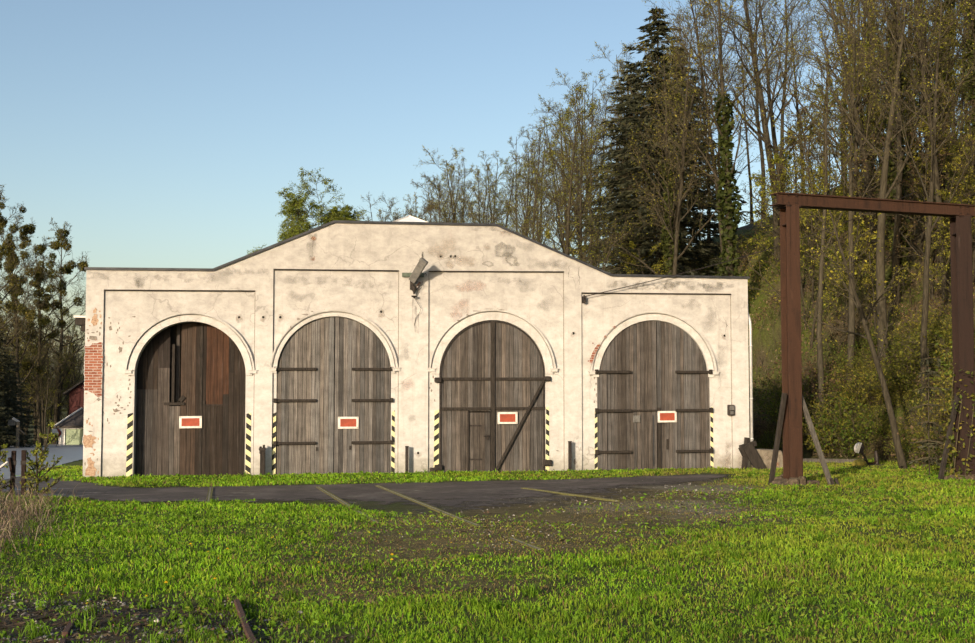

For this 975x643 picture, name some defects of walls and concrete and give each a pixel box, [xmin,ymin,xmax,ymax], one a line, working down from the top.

flaking render [84,307,130,401]
flaking render [82,418,99,477]